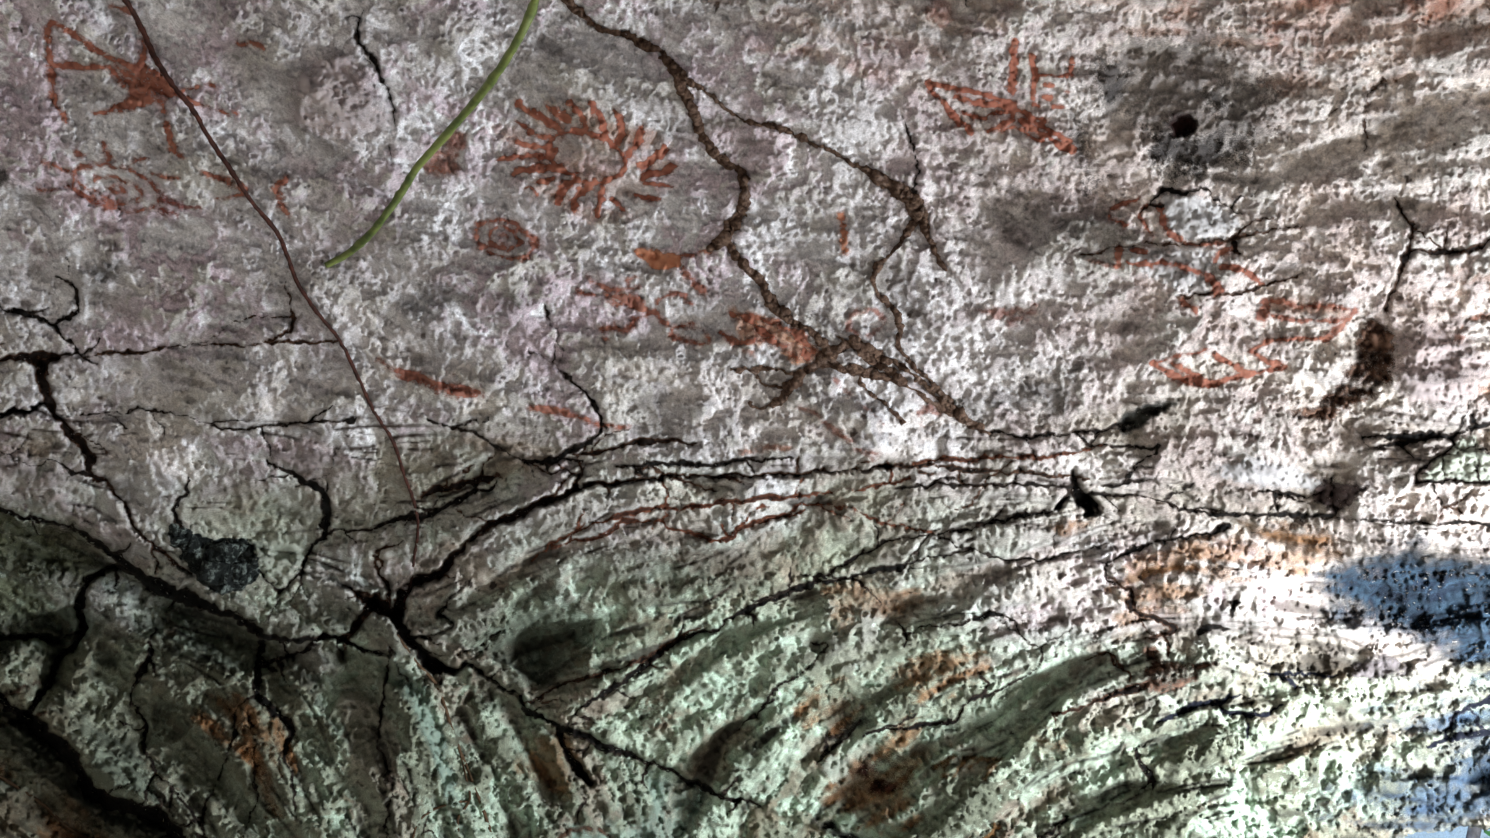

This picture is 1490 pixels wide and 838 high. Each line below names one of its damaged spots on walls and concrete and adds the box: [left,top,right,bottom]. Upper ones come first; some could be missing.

crack [353,10,395,166]
leakage [1094,63,1128,103]
crack [905,123,921,194]
leakage [1224,134,1255,161]
crack [1080,187,1302,256]
crack [1384,197,1490,313]
crack [0,257,1490,838]